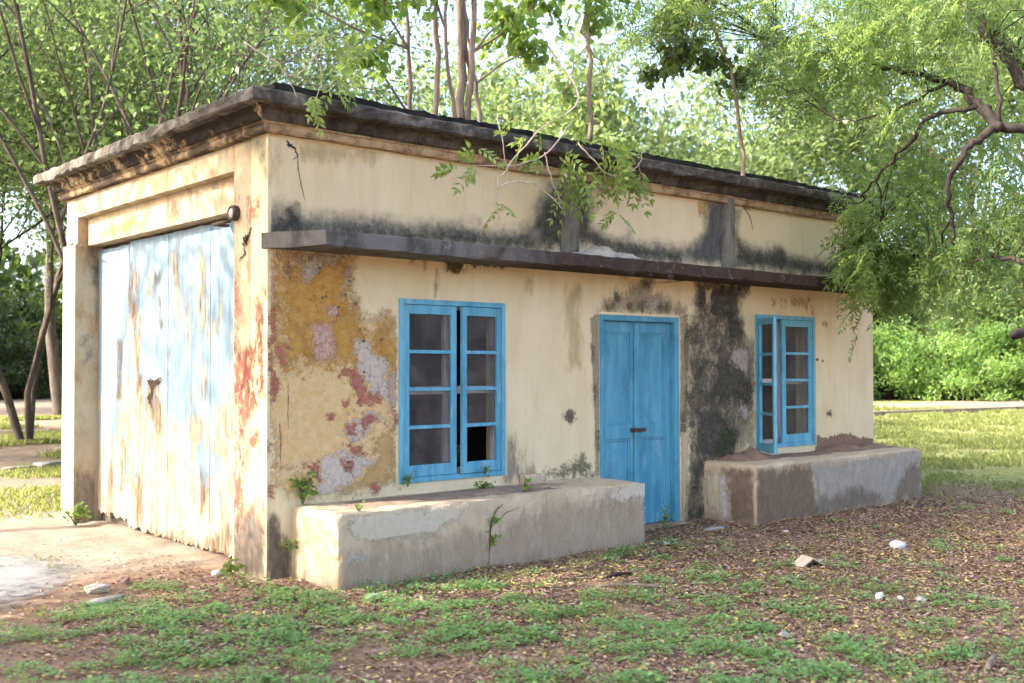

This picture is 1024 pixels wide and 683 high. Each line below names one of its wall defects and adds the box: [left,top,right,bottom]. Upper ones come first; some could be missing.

crack [286,140,305,199]
corrosion [116,252,178,404]
corrosion [195,248,208,332]
water stain [271,185,561,248]
water stain [444,262,506,274]
water stain [578,184,722,279]
water stain [737,239,848,275]
peeling [233,250,399,534]
water stain [603,279,876,524]
corrosion [108,436,231,555]
peeling [347,505,467,544]
peeling [608,483,645,503]